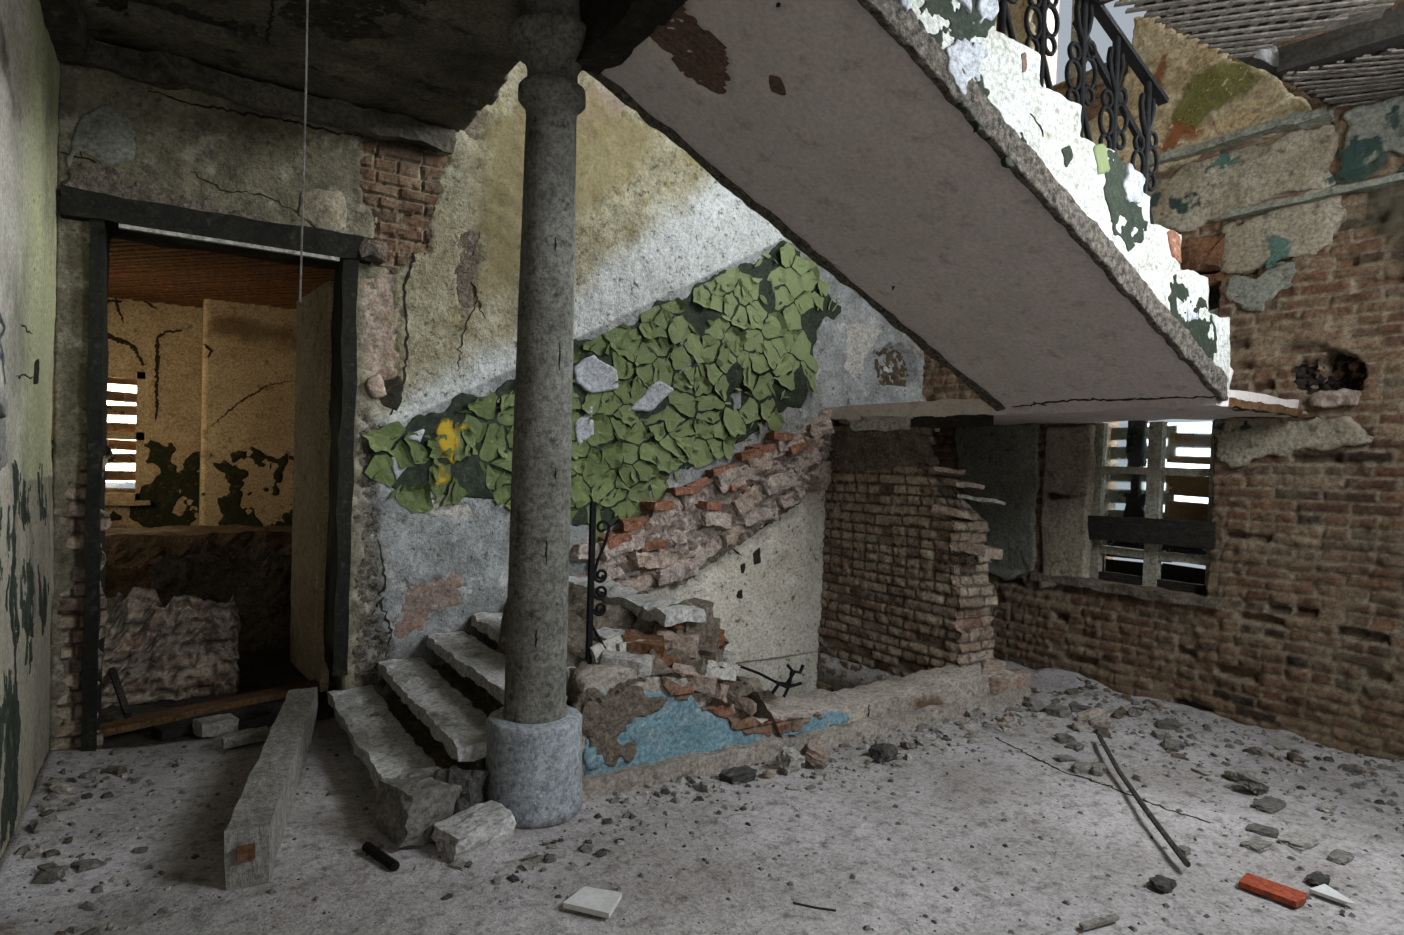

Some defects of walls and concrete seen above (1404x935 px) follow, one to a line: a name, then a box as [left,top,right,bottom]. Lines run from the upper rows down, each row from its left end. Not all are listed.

spalling [769,75,786,96]
spalling [857,0,1368,418]
spalling [0,387,294,850]
peeling [352,139,515,688]
peeling [571,598,850,775]
spalling [737,547,761,599]
peeling [570,240,938,591]